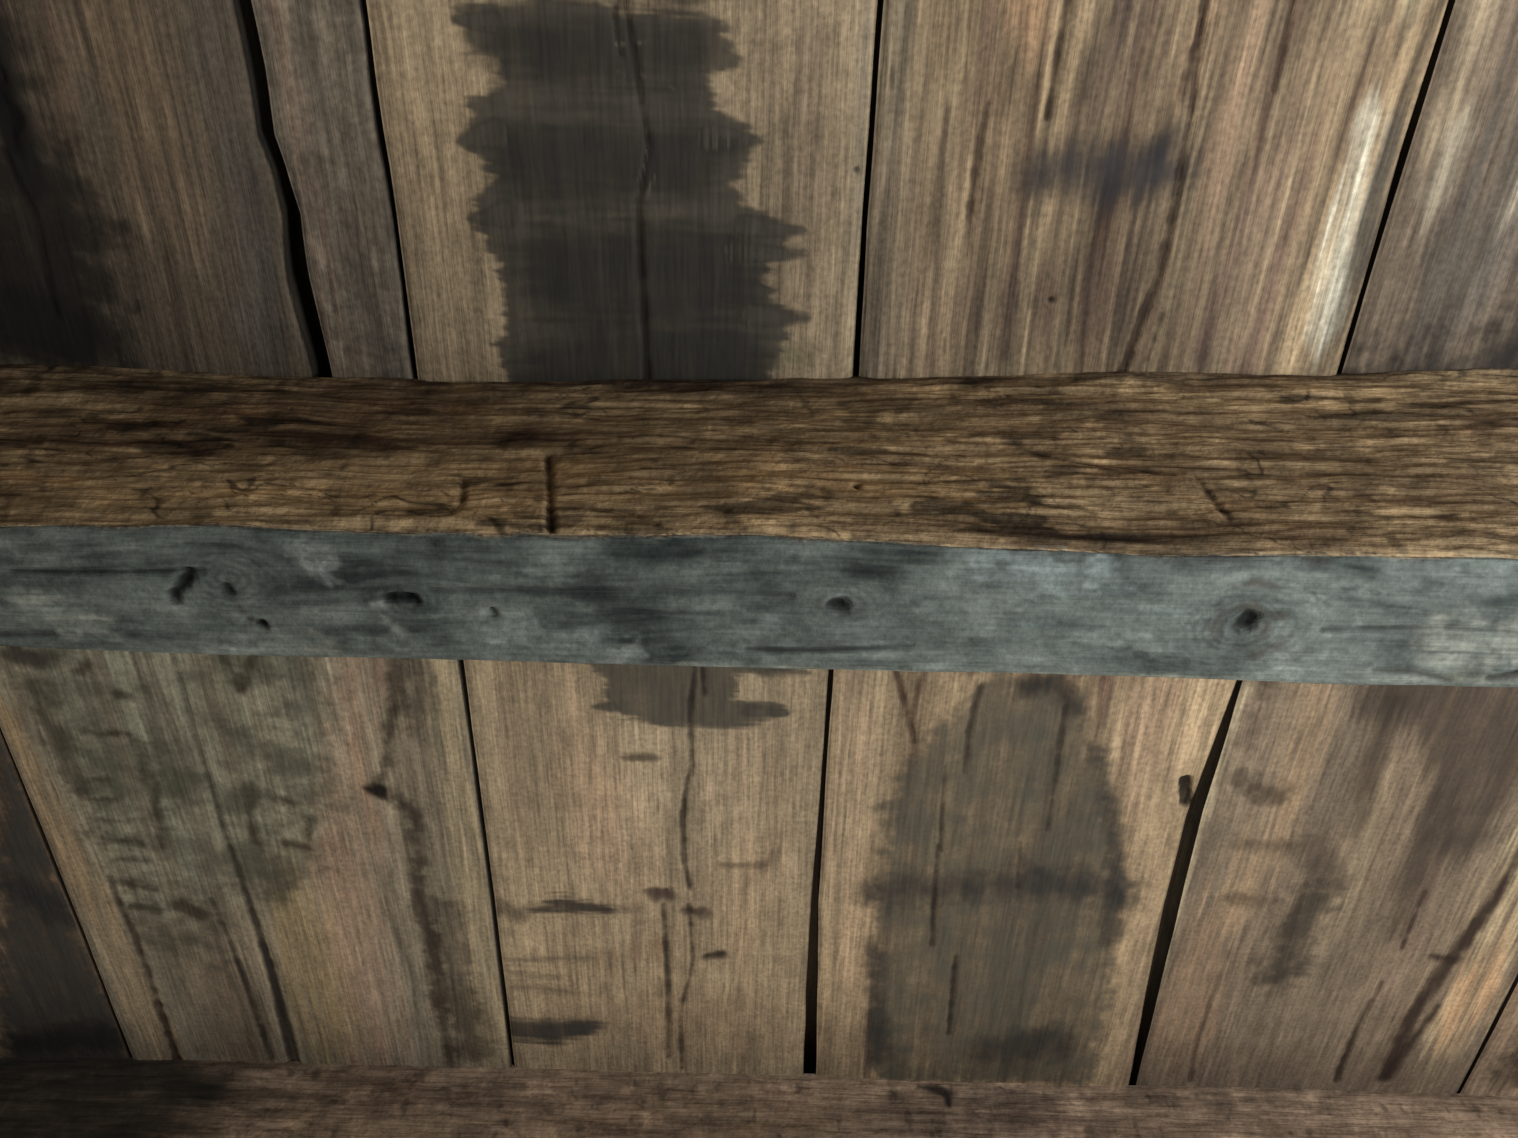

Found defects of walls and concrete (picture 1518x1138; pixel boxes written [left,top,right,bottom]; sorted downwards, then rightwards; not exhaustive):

leakage [0,25,112,366]
leakage [452,0,809,382]
leakage [5,646,48,669]
leakage [0,742,228,1138]
leakage [591,664,808,728]
leakage [871,678,1124,1083]